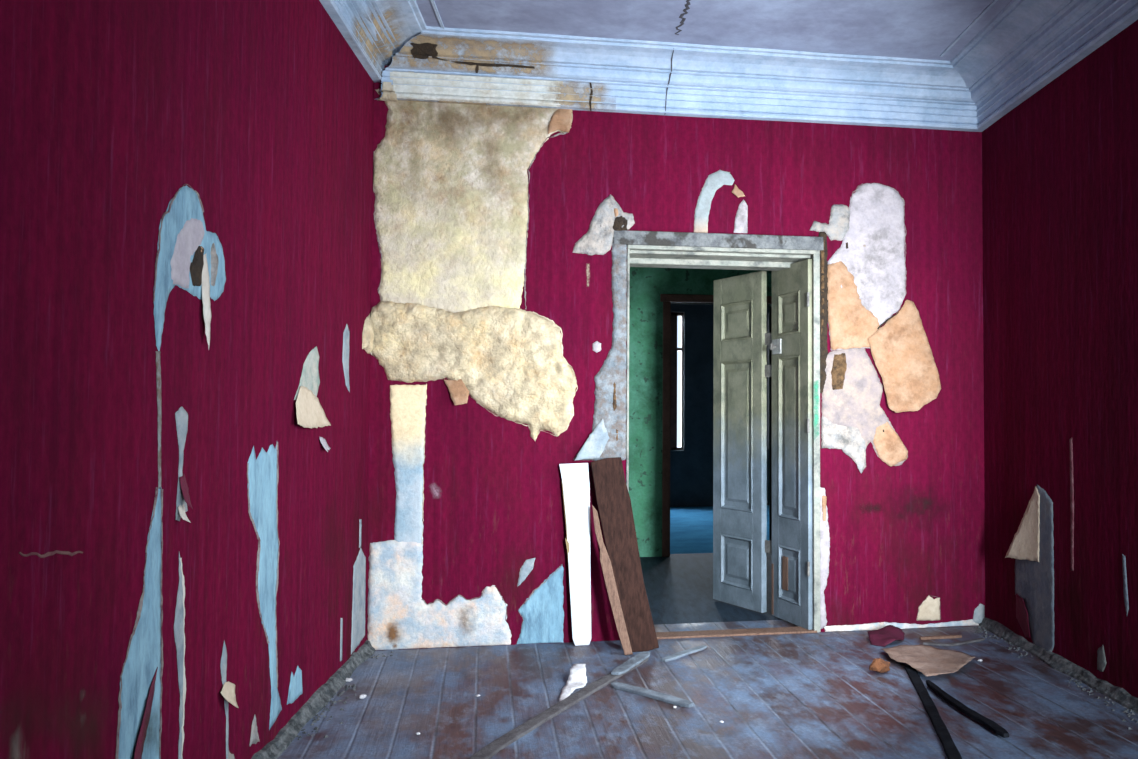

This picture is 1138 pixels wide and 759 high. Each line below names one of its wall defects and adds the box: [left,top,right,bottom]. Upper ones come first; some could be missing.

peeling [378,43,563,107]
crack [664,0,691,115]
flaking render [572,194,635,461]
flaking render [810,204,908,473]
peeling [178,504,191,523]
flaking render [367,540,512,650]
peeling [220,681,239,708]